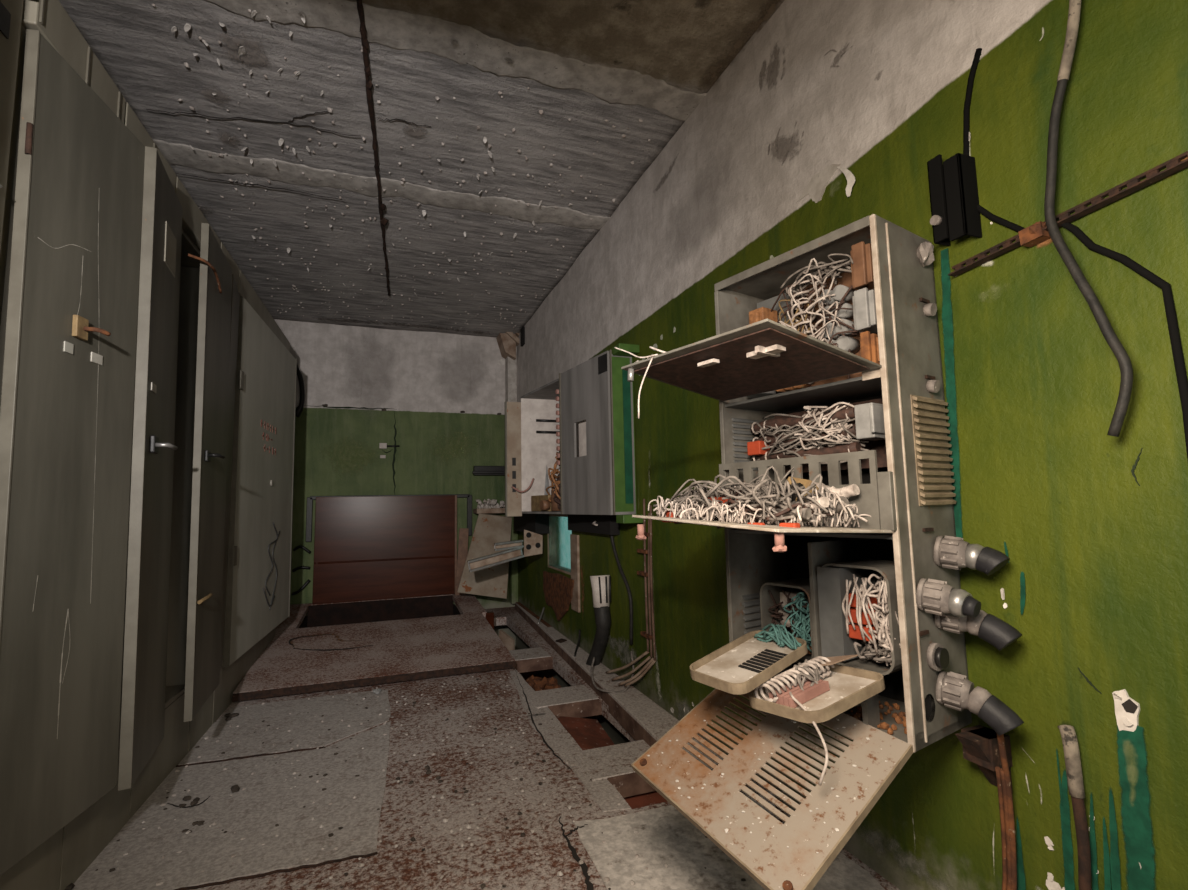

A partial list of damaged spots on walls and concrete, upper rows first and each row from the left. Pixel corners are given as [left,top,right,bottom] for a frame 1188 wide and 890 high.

damp [703,0,784,85]
crack [304,405,397,494]
flaking render [1112,689,1140,732]
crack [559,816,593,890]
flaking render [1046,872,1065,890]